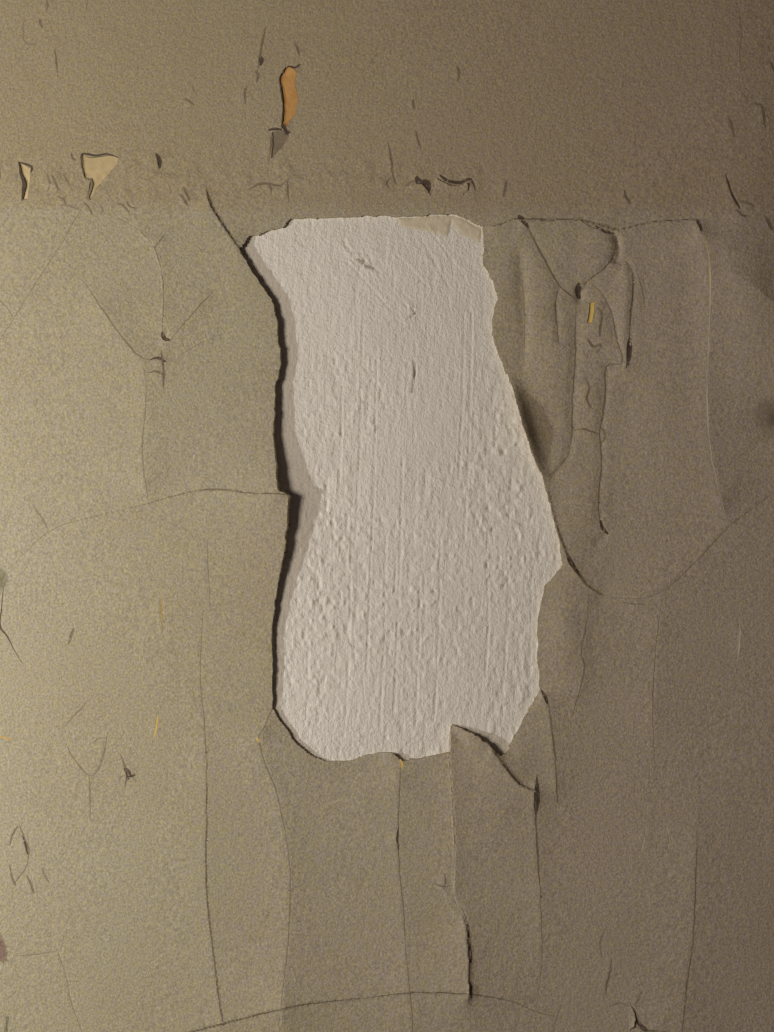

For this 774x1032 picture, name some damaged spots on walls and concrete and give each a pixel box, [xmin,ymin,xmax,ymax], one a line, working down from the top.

peeling [271,67,299,159]
peeling [18,162,33,201]
peeling [80,153,120,200]
peeling [139,188,622,1025]
crack [62,703,135,818]
crack [193,543,559,1032]
crack [9,825,50,894]
crack [599,856,697,1032]